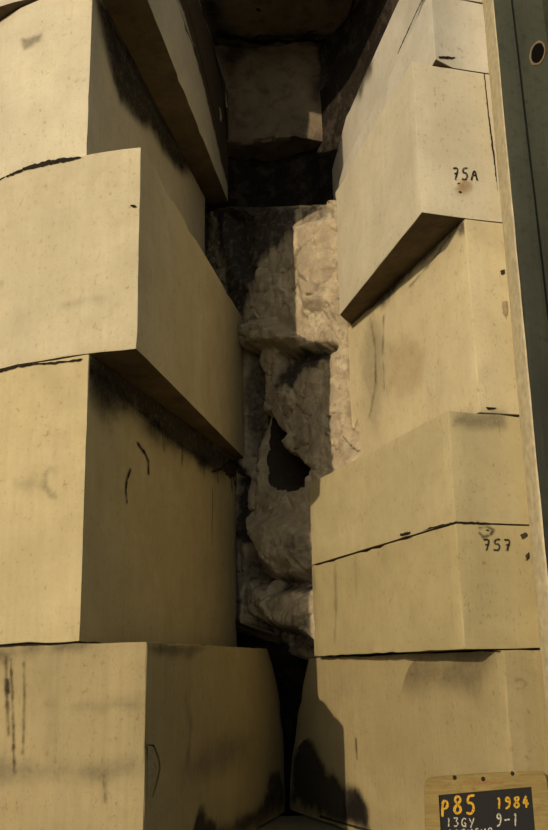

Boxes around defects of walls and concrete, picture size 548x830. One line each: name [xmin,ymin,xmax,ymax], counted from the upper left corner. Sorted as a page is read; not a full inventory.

damp [180,0,242,184]
crack [0,156,81,180]
crack [0,358,82,372]
spalling [205,200,361,660]
crack [0,641,60,649]
damp [5,659,15,766]